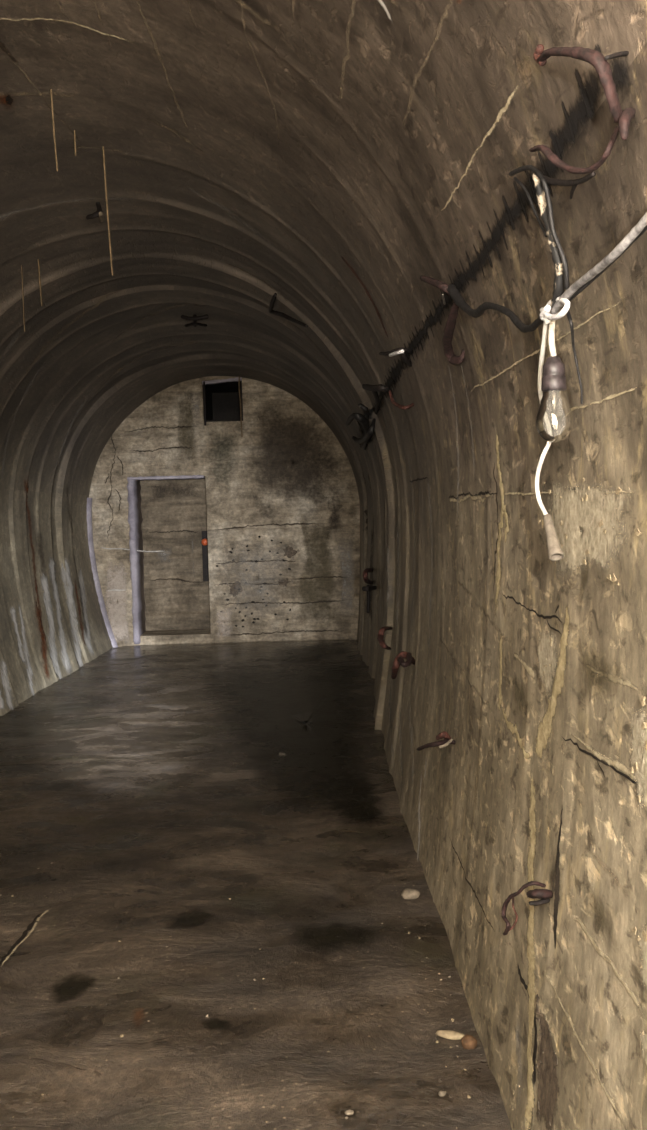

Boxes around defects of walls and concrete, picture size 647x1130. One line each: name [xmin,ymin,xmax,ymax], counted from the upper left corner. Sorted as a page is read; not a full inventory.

damp [253,414,334,499]
corrosion [25,482,49,679]
damp [301,507,352,614]
crack [449,463,561,634]
crack [563,738,638,785]
crack [553,808,563,949]